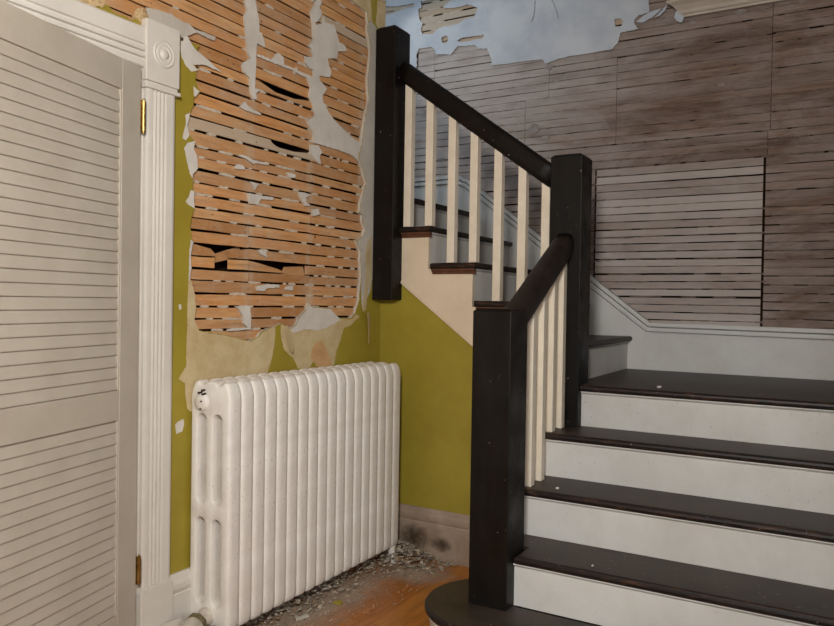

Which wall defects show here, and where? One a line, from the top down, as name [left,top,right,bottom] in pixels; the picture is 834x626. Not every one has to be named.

spalling [79,0,477,412]
spalling [417,0,834,329]